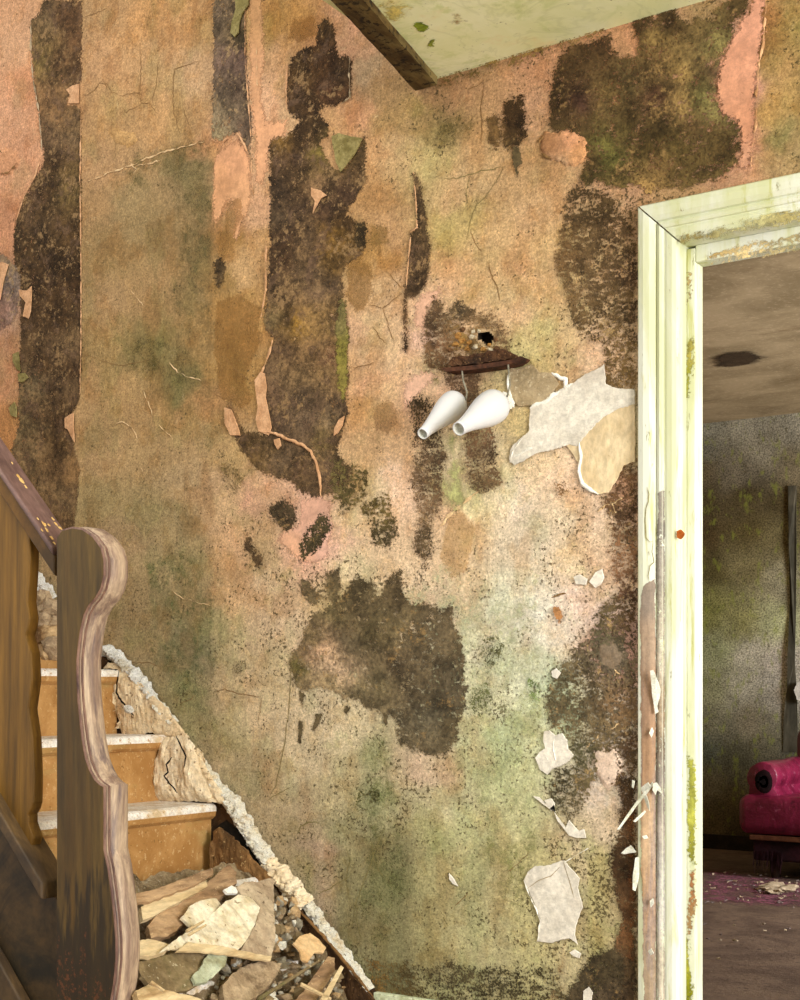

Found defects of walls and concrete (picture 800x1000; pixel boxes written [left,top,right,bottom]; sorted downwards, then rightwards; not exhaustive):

leakage [435,0,751,389]
mould [327,459,398,554]
peeling [403,327,500,569]
spalling [460,364,636,496]
spalling [102,644,179,725]
leakage [286,564,493,757]
mould [364,458,638,1000]
spalling [535,730,574,775]
peeling [180,898,221,928]
spalling [205,760,375,992]
spalling [523,796,596,958]